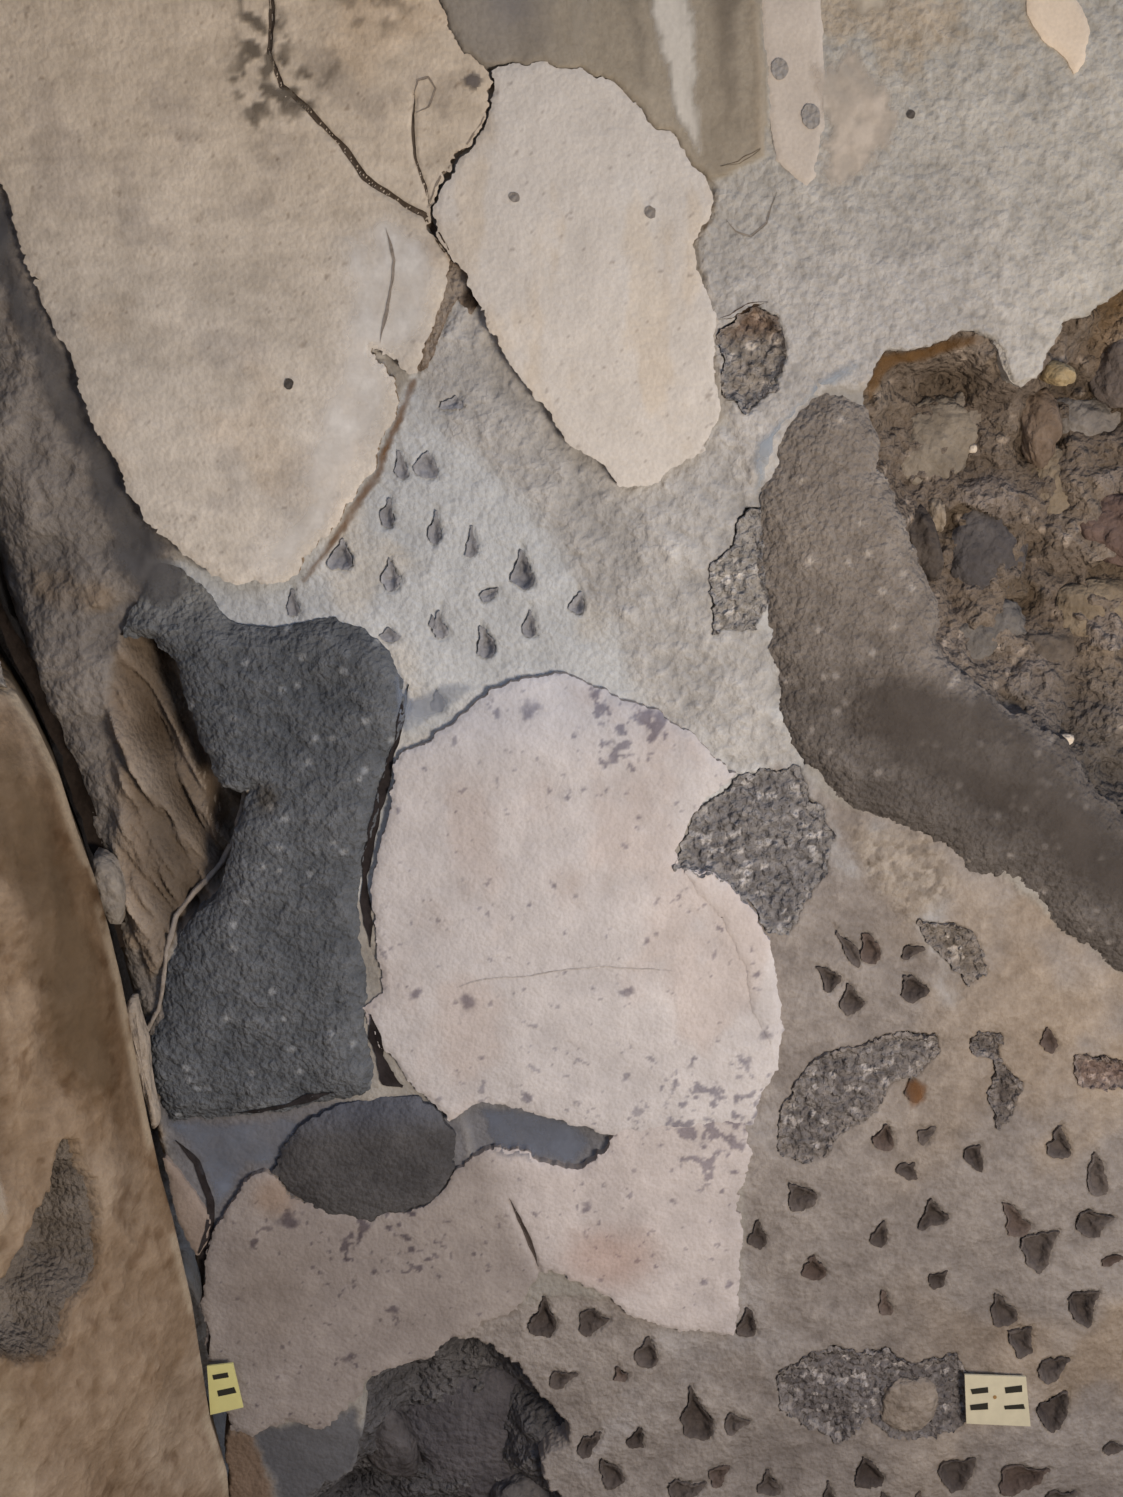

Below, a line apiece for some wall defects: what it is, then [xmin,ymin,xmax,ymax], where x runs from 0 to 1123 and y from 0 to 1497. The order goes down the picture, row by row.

crack [267,0,492,372]
leakage [651,0,699,144]
flaking render [863,290,1123,836]